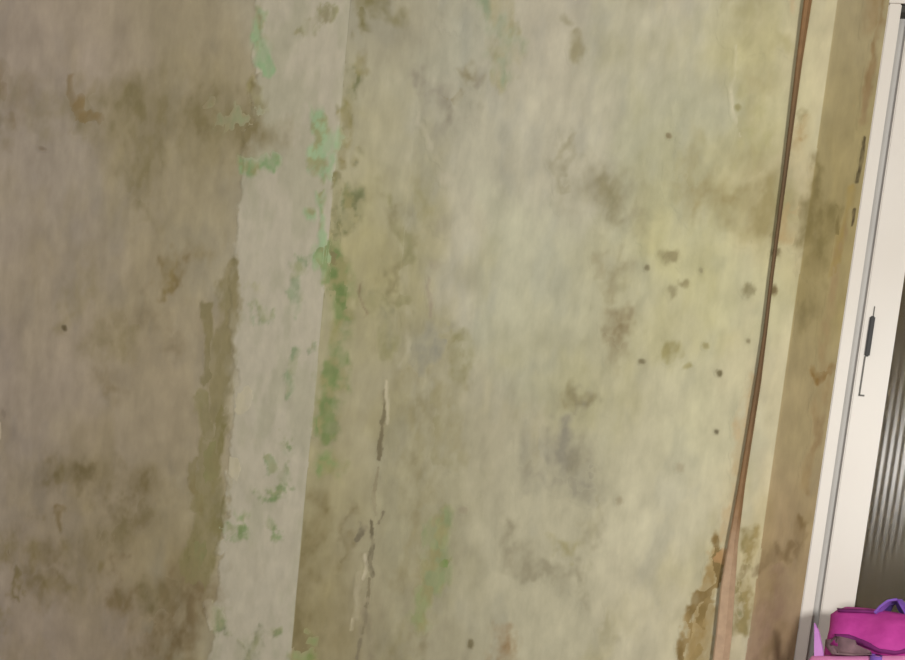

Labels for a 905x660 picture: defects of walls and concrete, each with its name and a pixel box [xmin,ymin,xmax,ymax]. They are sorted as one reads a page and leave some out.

water stain [0,26,307,660]
peeling [202,0,374,660]
crack [353,388,386,660]
peeling [471,0,532,98]
water stain [542,0,845,380]
water stain [739,511,810,660]